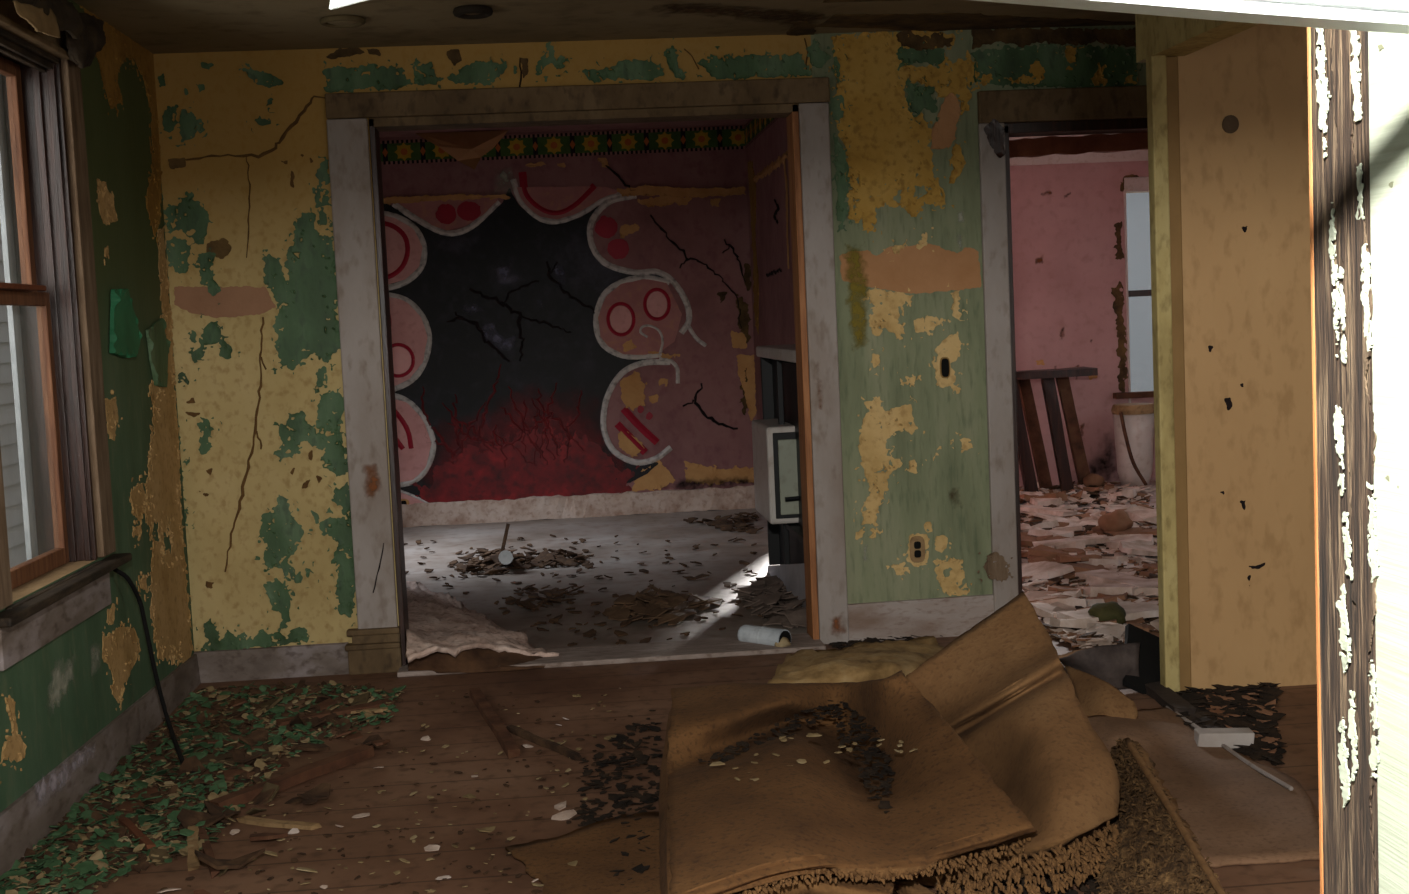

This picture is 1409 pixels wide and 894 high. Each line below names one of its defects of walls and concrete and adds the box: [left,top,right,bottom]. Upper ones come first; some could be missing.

peeling [80,6,357,711]
crack [224,317,267,572]
crack [186,96,325,258]
crack [605,165,782,328]
crack [682,383,738,430]
peeling [322,13,1143,544]
peeling [1315,28,1399,894]